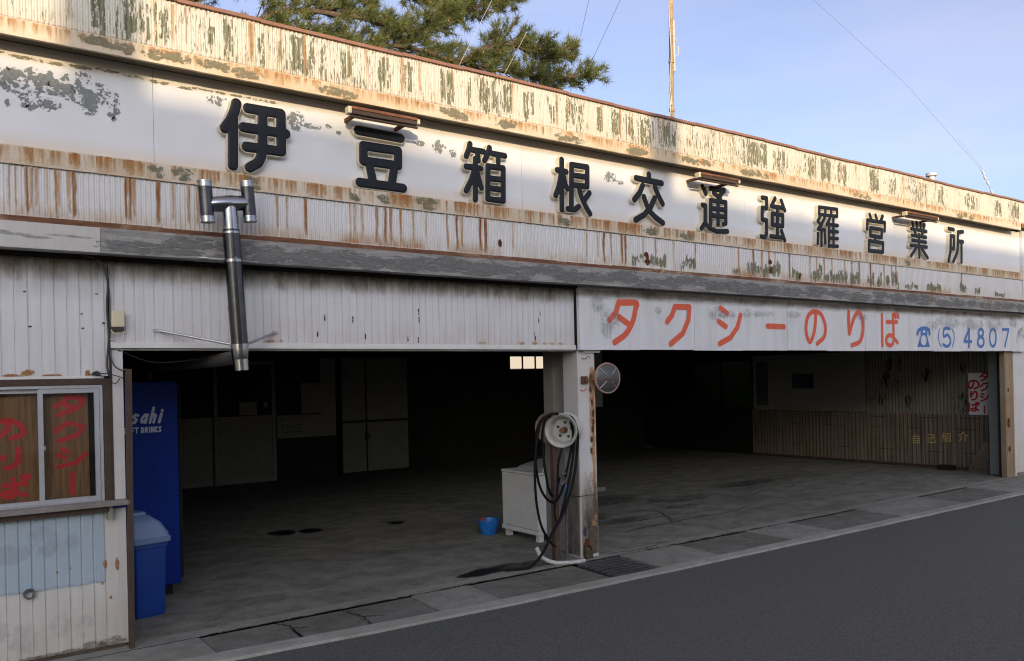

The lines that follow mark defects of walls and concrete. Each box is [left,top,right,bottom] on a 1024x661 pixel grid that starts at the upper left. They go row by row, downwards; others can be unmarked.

peeling [0,51,275,122]
peeling [287,111,341,135]
peeling [291,34,358,100]
peeling [378,57,412,92]
peeling [415,140,457,157]
peeling [439,68,534,129]
peeling [549,99,584,144]
peeling [597,107,713,167]
corrosion [8,147,151,218]
corrosion [156,181,174,222]
peeling [241,241,941,305]
corrosion [3,369,62,377]